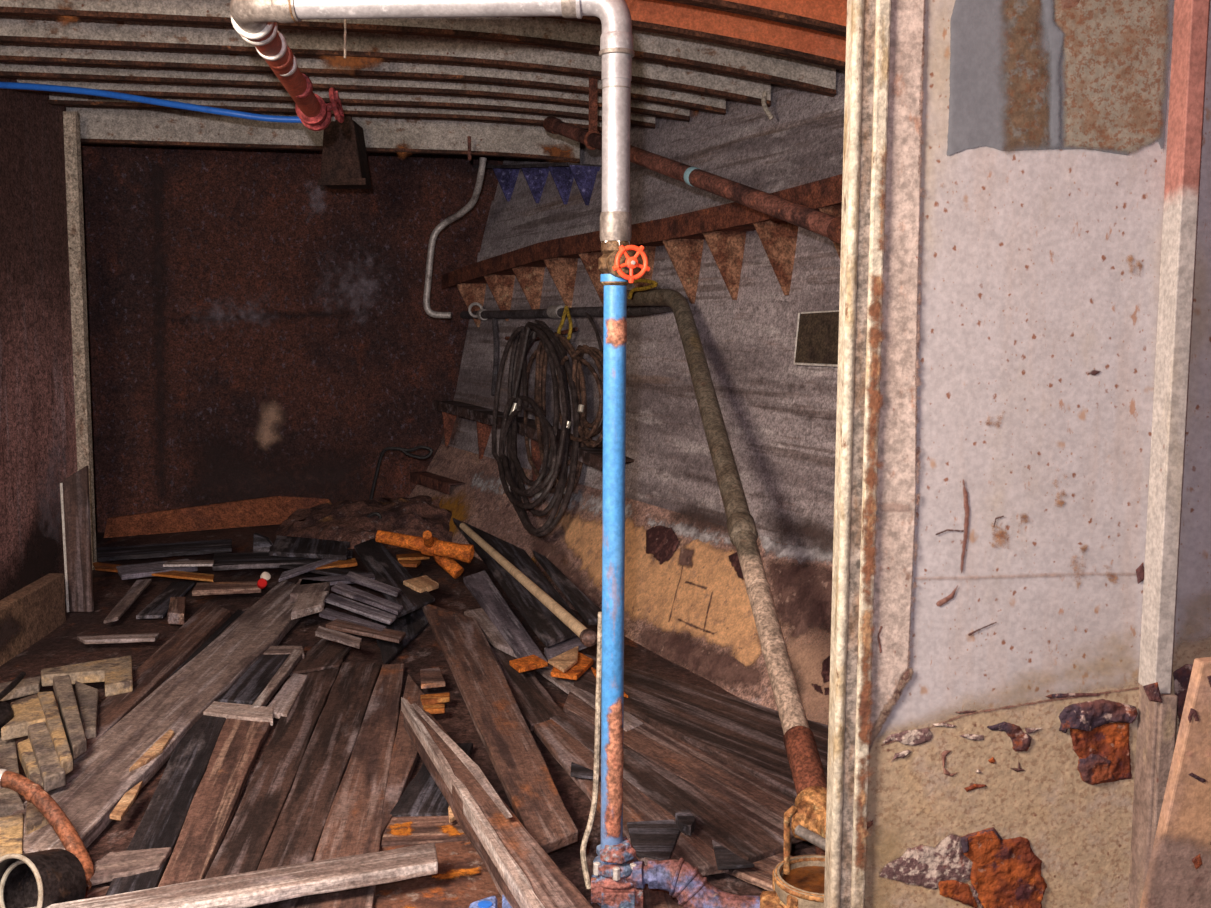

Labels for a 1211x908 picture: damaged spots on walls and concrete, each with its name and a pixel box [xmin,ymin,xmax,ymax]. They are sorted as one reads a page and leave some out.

peeling [947,0,1173,156]
water stain [261,408,277,444]
rust [855,276,883,868]
peeling [941,750,957,776]
spalling [883,711,1042,772]
spalling [1046,693,1138,785]
spalling [879,827,1047,908]